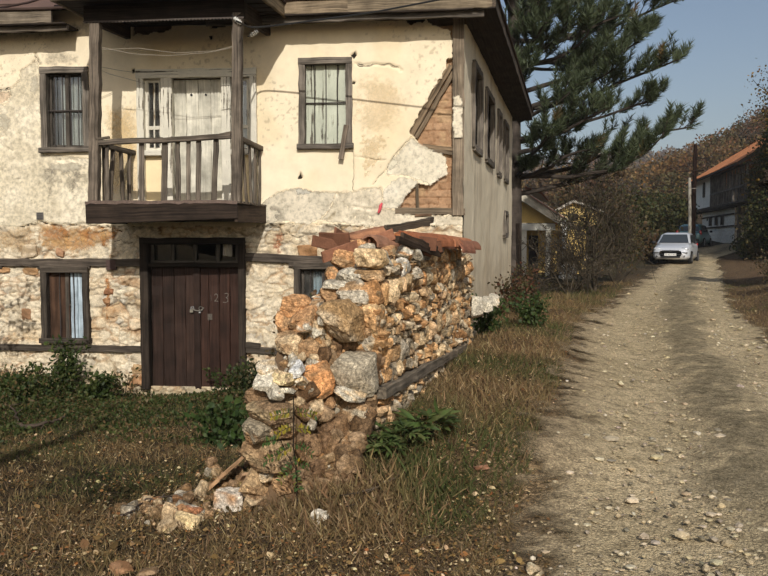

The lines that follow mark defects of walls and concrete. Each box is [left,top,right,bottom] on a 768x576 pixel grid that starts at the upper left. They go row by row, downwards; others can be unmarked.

flaking render [262,138,462,226]